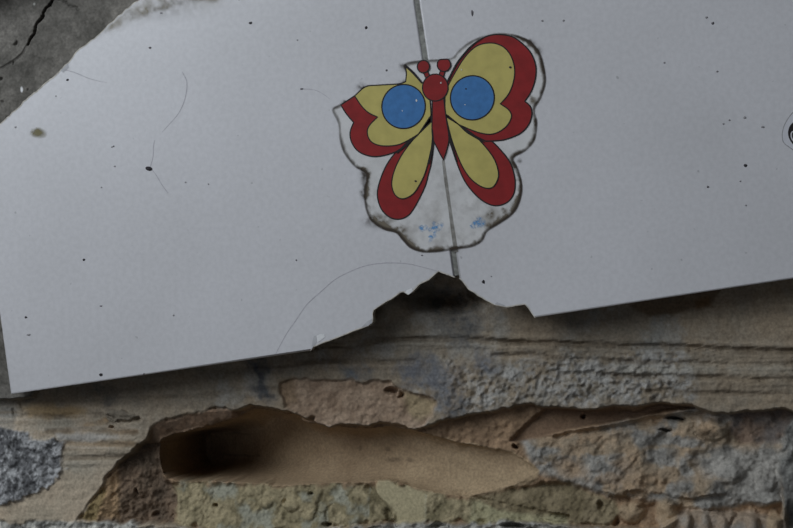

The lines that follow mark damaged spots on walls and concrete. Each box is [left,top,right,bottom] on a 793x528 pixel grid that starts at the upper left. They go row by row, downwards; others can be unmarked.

crack [0,0,81,70]
spalling [76,375,793,528]